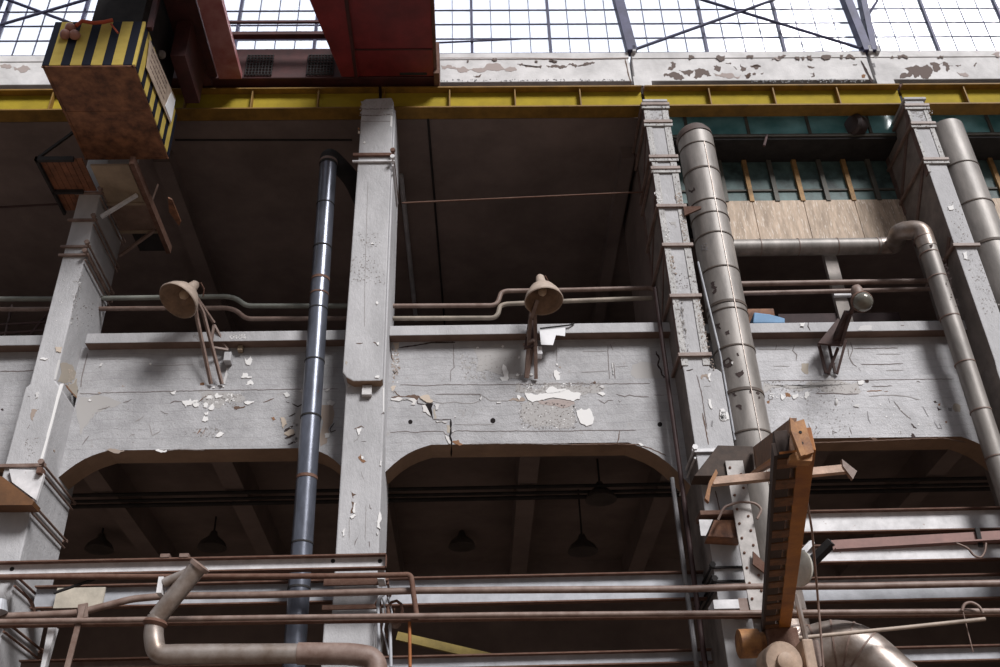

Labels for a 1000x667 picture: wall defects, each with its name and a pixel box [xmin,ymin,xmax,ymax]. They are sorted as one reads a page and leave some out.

peeling [441,58,595,82]
peeling [664,54,876,83]
peeling [891,54,977,79]
crack [330,188,506,457]
peeling [166,356,254,437]
peeling [460,344,606,429]